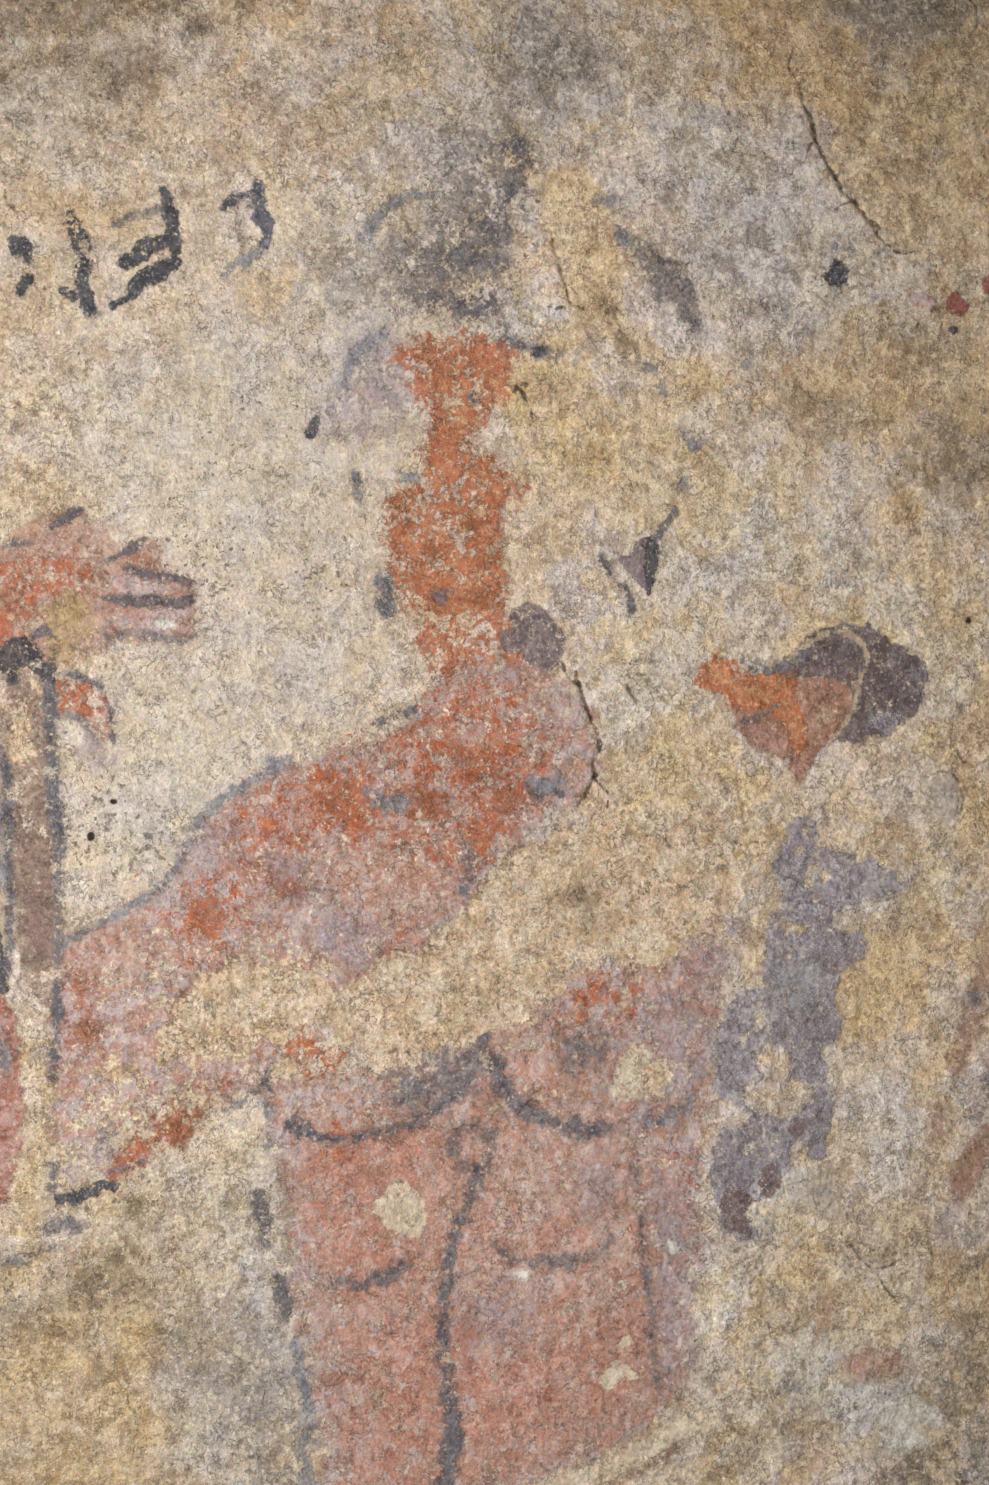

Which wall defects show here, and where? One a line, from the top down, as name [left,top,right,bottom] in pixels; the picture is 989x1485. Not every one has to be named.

crack [788,51,912,254]
crack [561,661,608,808]